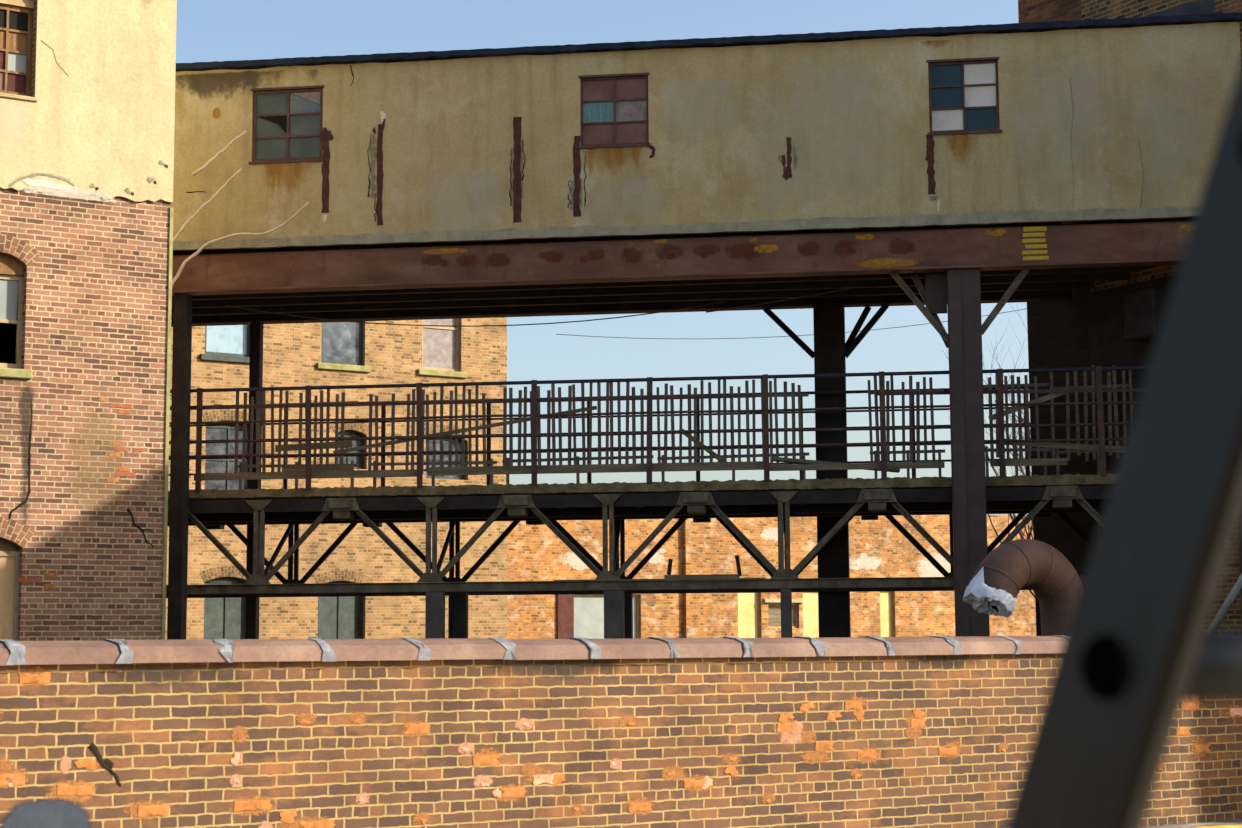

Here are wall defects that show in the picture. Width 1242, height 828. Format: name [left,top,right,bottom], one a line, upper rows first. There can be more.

peeling [23,179,134,203]
corrosion [656,243,760,260]
crack [126,508,154,548]
crack [88,743,121,787]